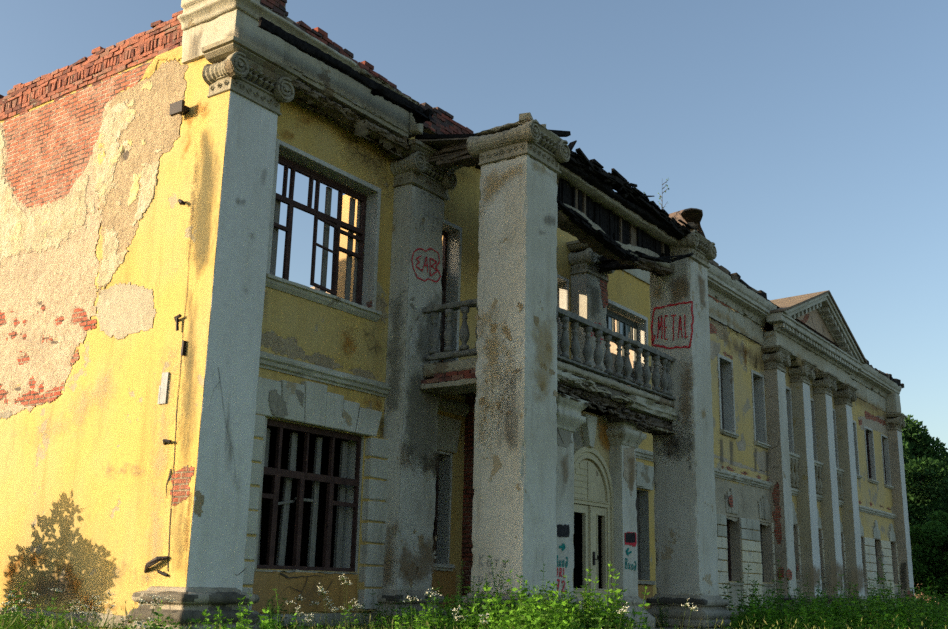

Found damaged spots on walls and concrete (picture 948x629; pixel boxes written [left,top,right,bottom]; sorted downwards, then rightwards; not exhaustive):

flaking render [0,48,188,419]
water stain [191,135,212,269]
water stain [183,345,193,440]
spalling [557,384,675,436]
flaking render [170,465,204,516]
flaking render [714,440,782,544]